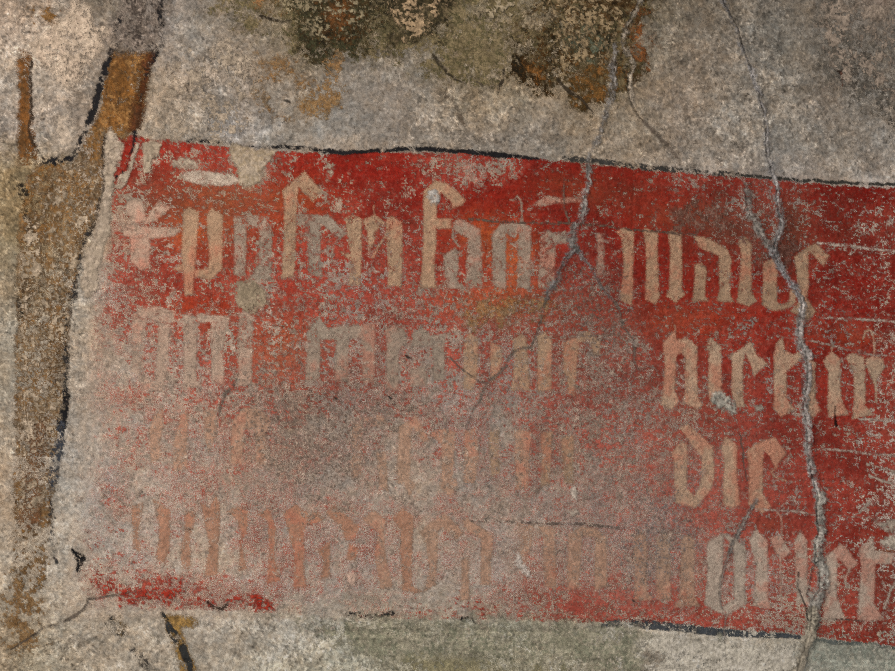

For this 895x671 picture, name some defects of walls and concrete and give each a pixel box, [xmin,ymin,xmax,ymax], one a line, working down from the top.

water stain [287,0,457,65]
crack [450,0,678,427]
water stain [506,0,661,118]
crack [718,0,830,671]